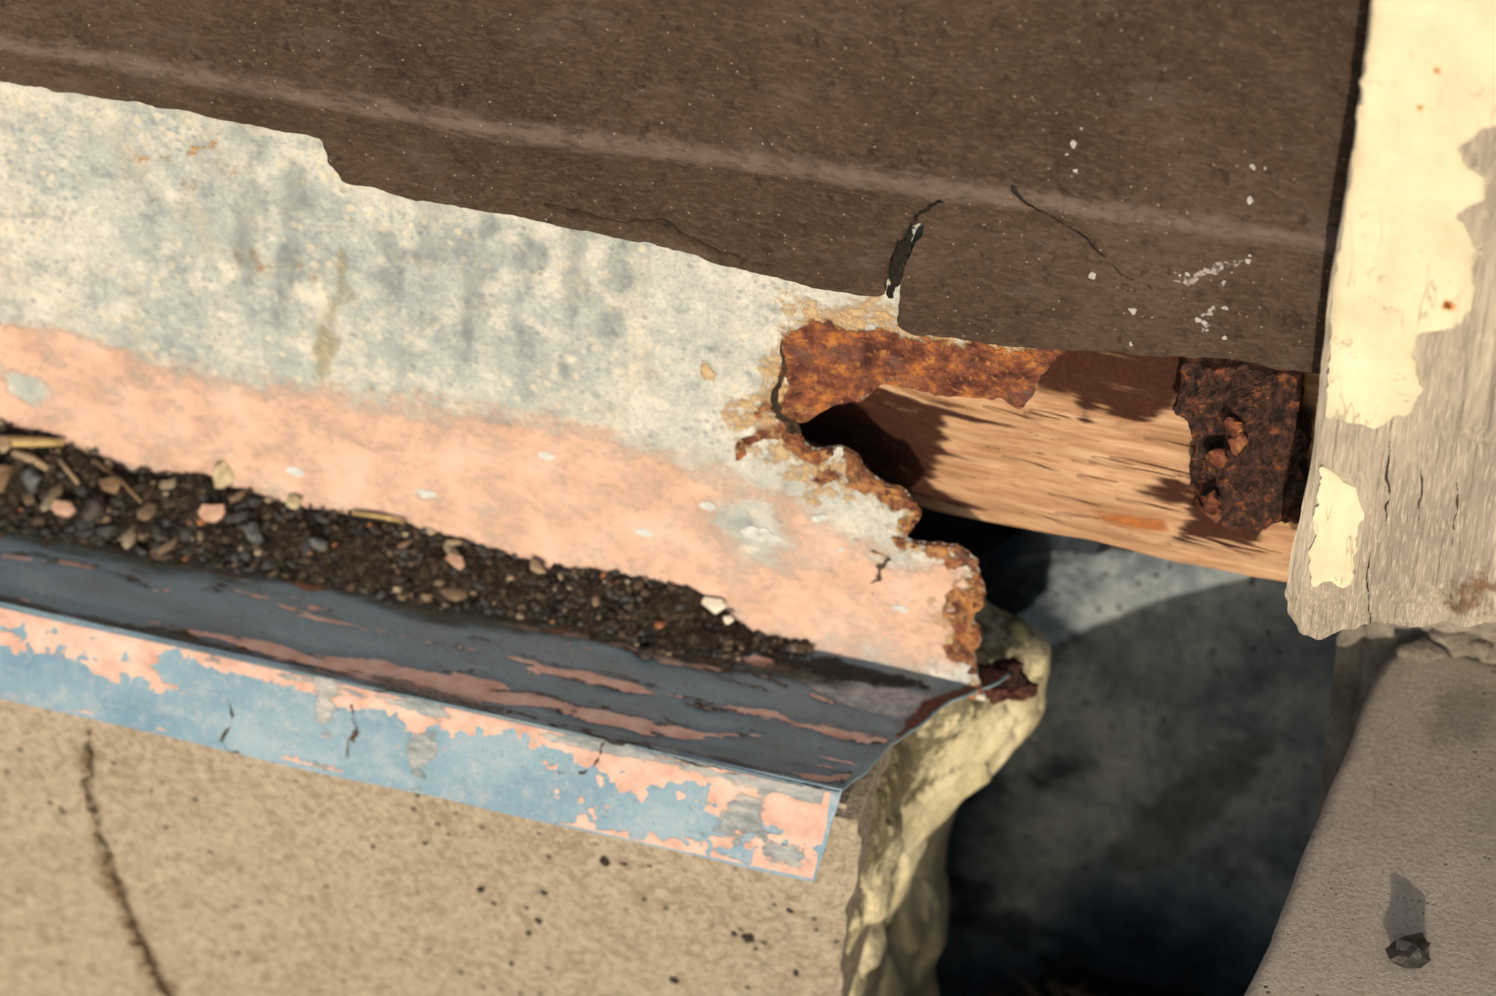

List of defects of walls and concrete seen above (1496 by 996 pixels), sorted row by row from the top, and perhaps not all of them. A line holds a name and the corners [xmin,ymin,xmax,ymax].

peeling [0,324,985,677]
corrosion [700,363,716,381]
corrosion [721,292,1066,744]
crack [886,200,950,299]
corrosion [1197,490,1223,516]
corrosion [1204,417,1249,469]
peeling [1309,464,1366,588]
peeling [1326,0,1496,429]
crack [81,730,170,996]
peeling [0,598,887,879]